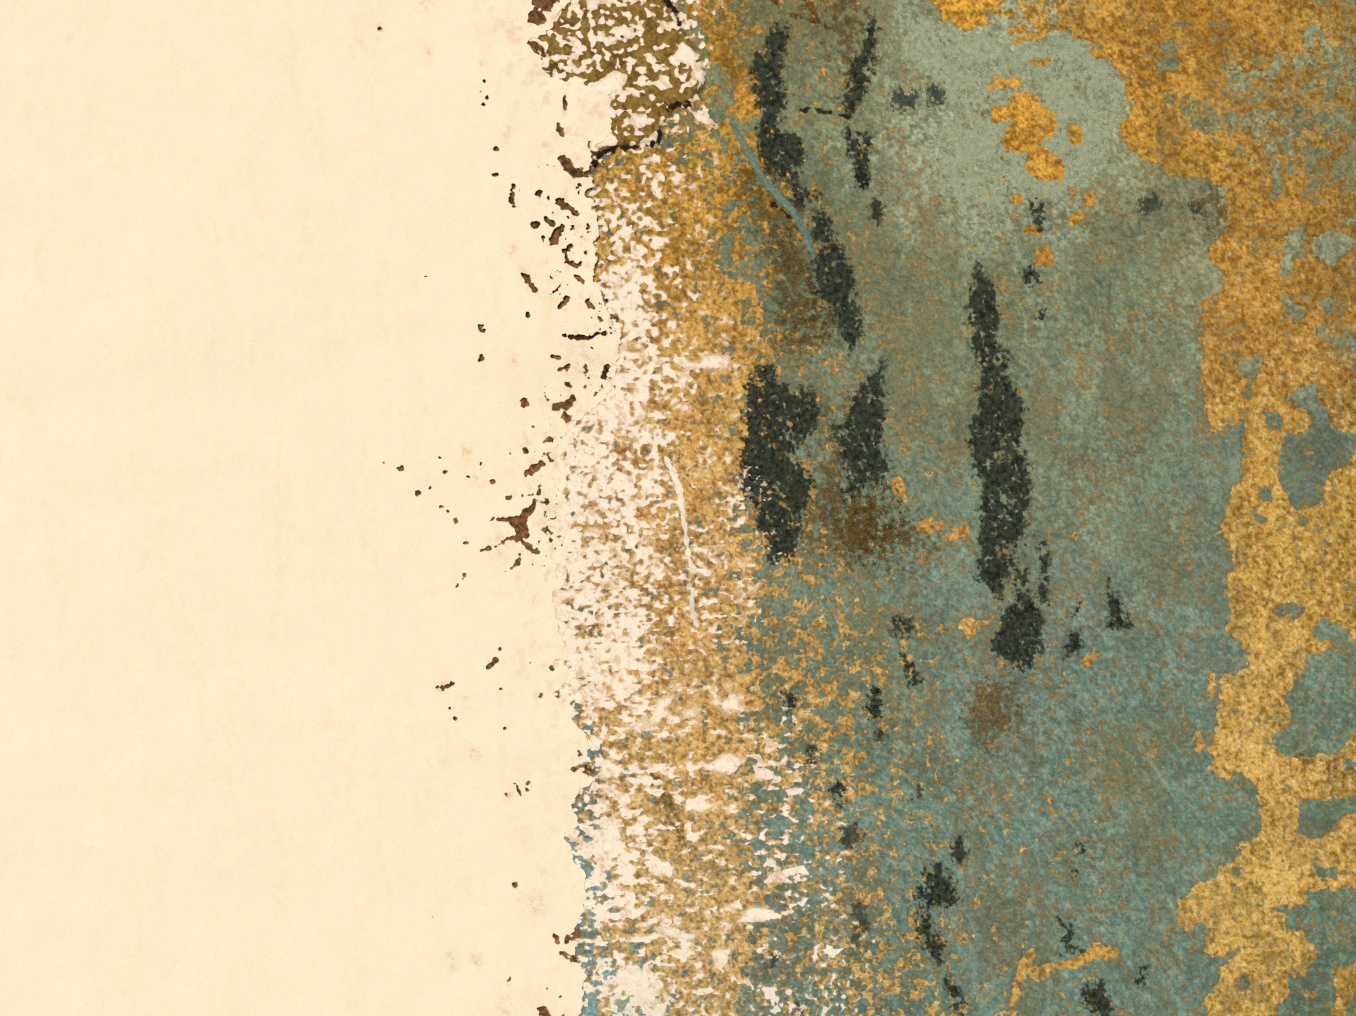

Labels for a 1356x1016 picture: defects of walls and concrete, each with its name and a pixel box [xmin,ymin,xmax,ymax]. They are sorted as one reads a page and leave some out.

peeling [463,0,1119,1016]
peeling [930,0,1356,1016]